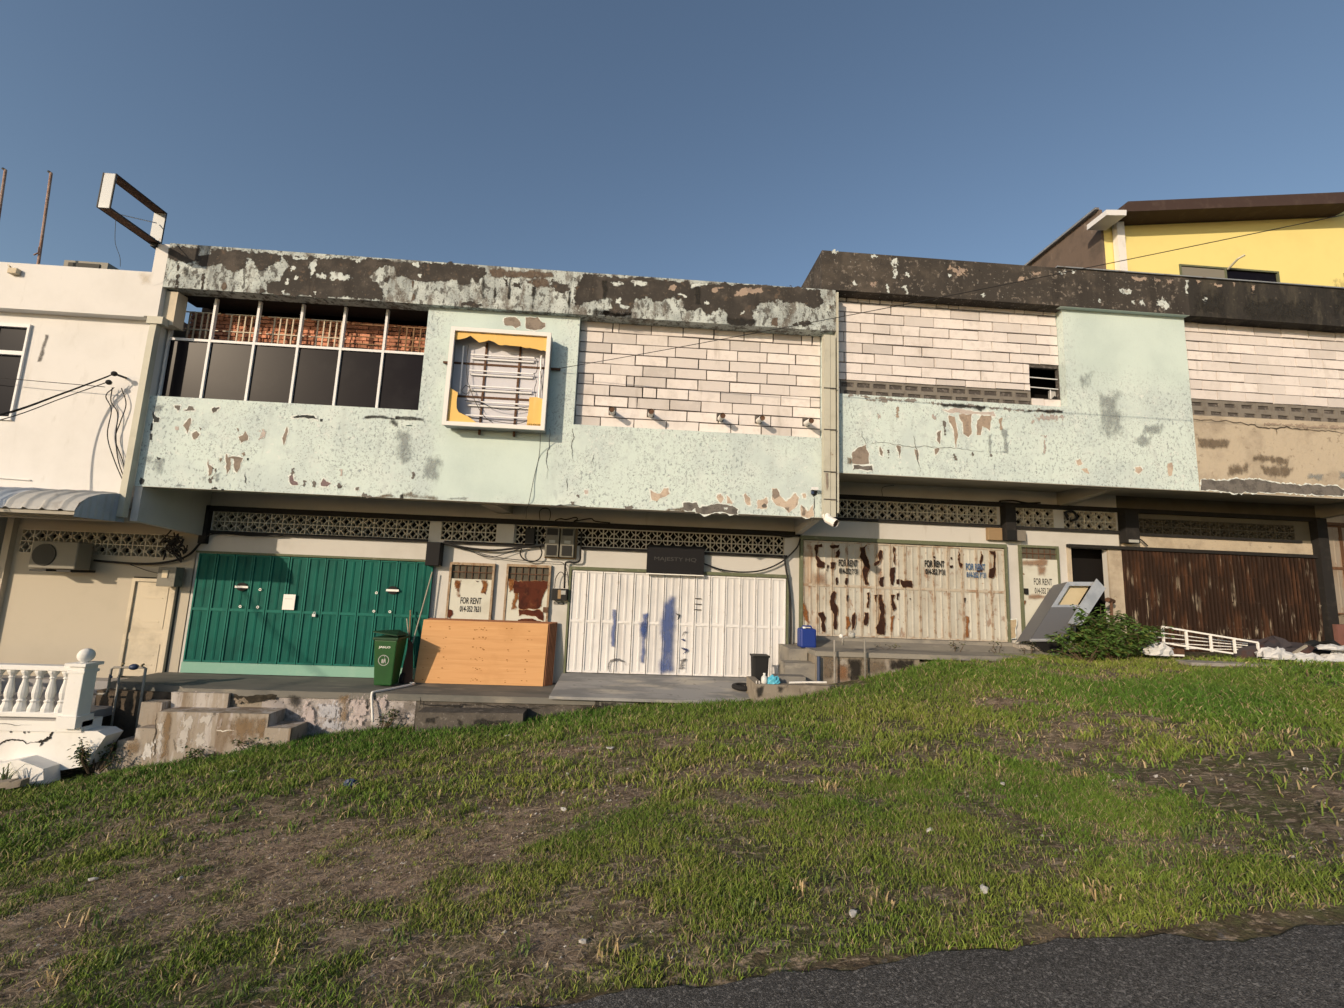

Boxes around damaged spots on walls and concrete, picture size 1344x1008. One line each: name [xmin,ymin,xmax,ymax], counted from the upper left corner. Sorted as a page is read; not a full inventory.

peeling [168,245,832,332]
peeling [852,254,910,294]
peeling [1119,276,1235,310]
spalling [150,404,221,440]
spalling [206,428,266,490]
peeling [848,407,1008,472]
leakage [1198,438,1228,448]
leakage [1229,456,1291,477]
spalling [649,487,817,519]
rust [933,550,996,578]
rust [803,543,913,635]
crack [0,723,53,746]